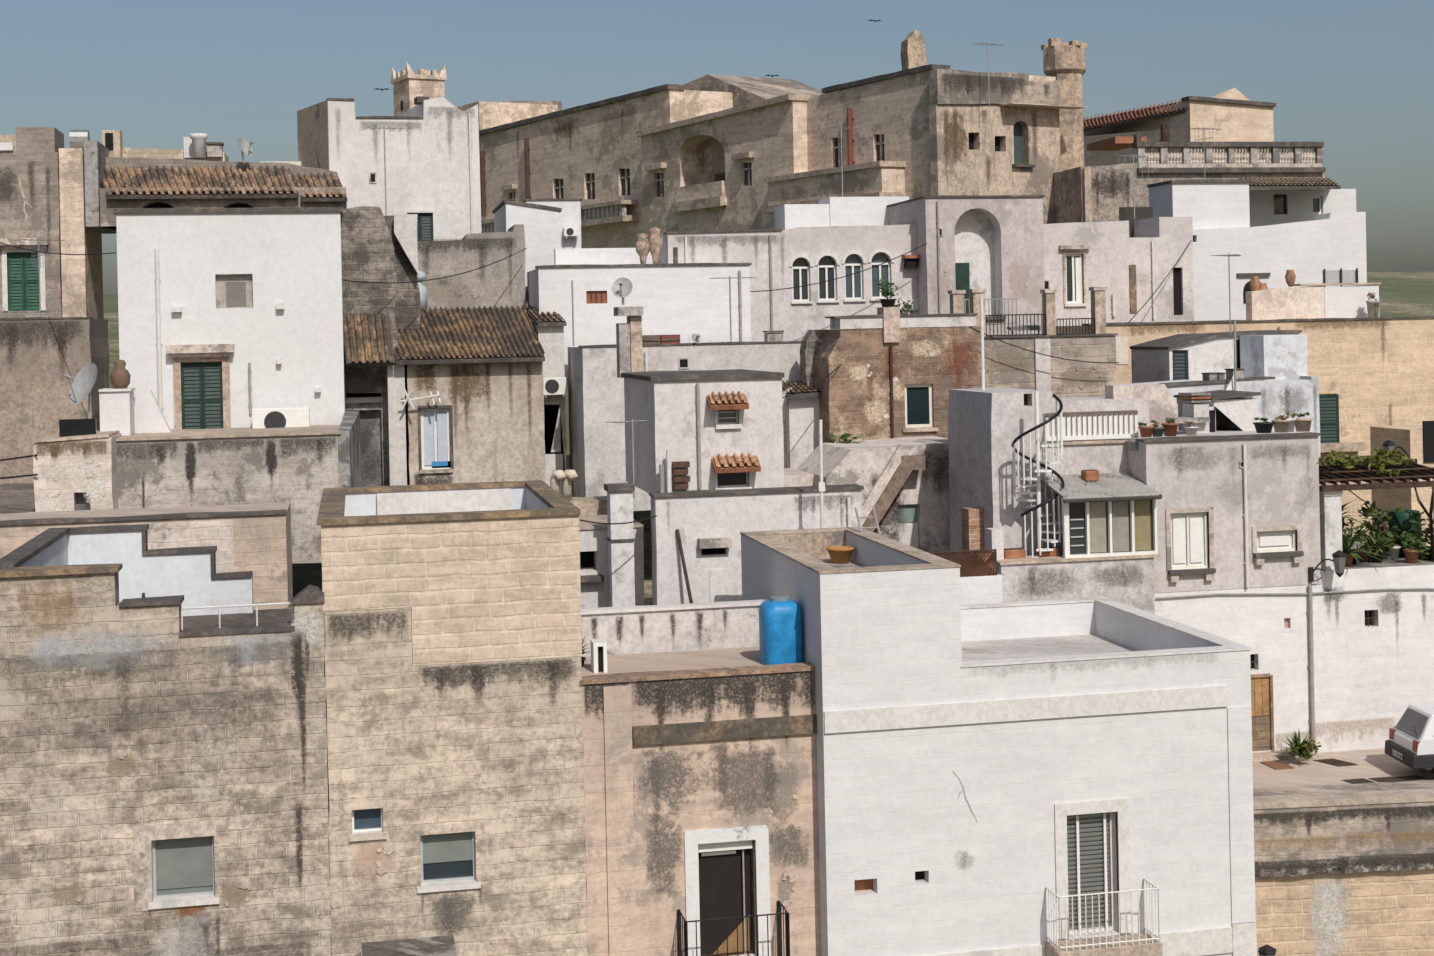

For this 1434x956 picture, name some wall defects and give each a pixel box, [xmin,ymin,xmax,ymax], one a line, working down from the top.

leakage [35,634,155,669]
leakage [224,606,405,780]
leakage [423,660,571,693]
leakage [585,671,814,725]
leakage [644,745,778,892]
leakage [770,824,807,864]